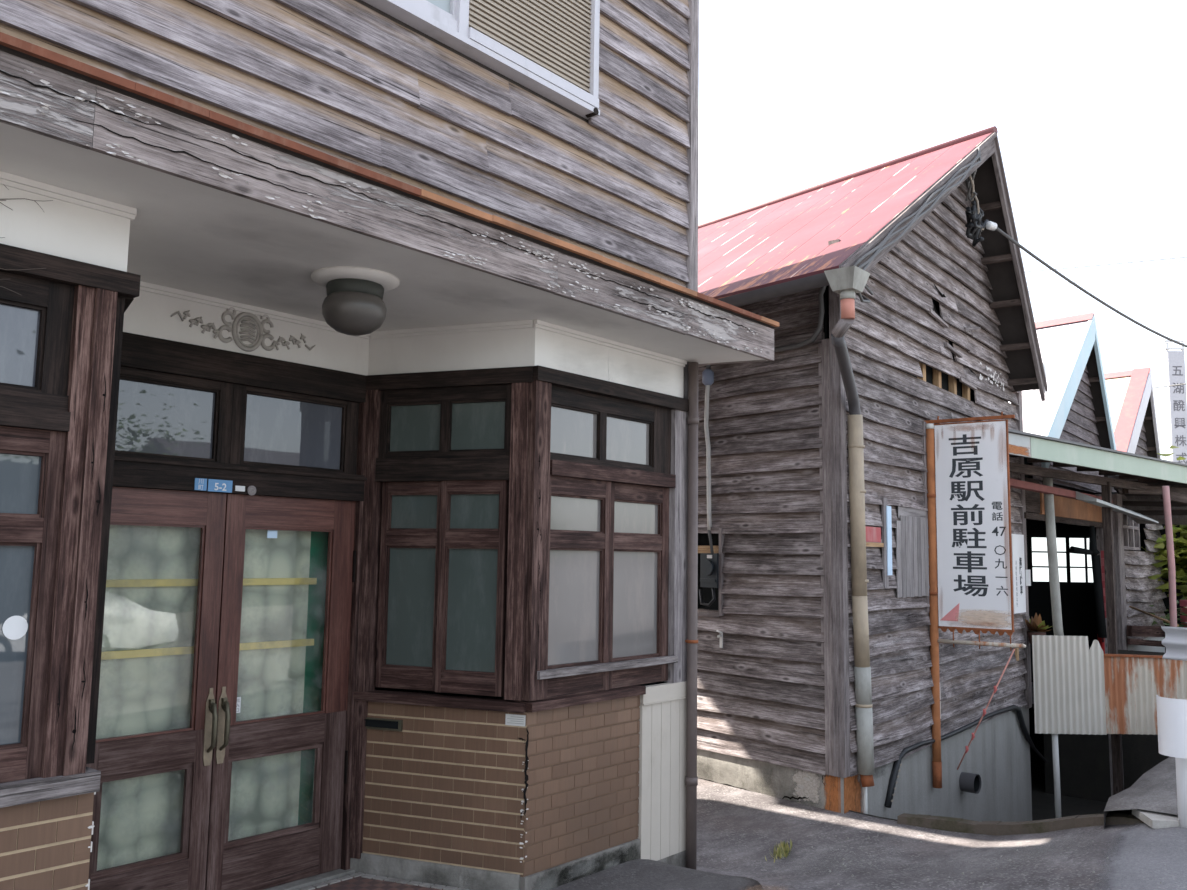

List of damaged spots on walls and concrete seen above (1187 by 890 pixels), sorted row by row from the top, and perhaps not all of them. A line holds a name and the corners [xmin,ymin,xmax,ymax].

peeling [75,89,160,124]
peeling [106,143,148,164]
peeling [265,194,327,220]
peeling [472,232,627,314]
peeling [631,286,762,352]
crack [518,729,529,818]